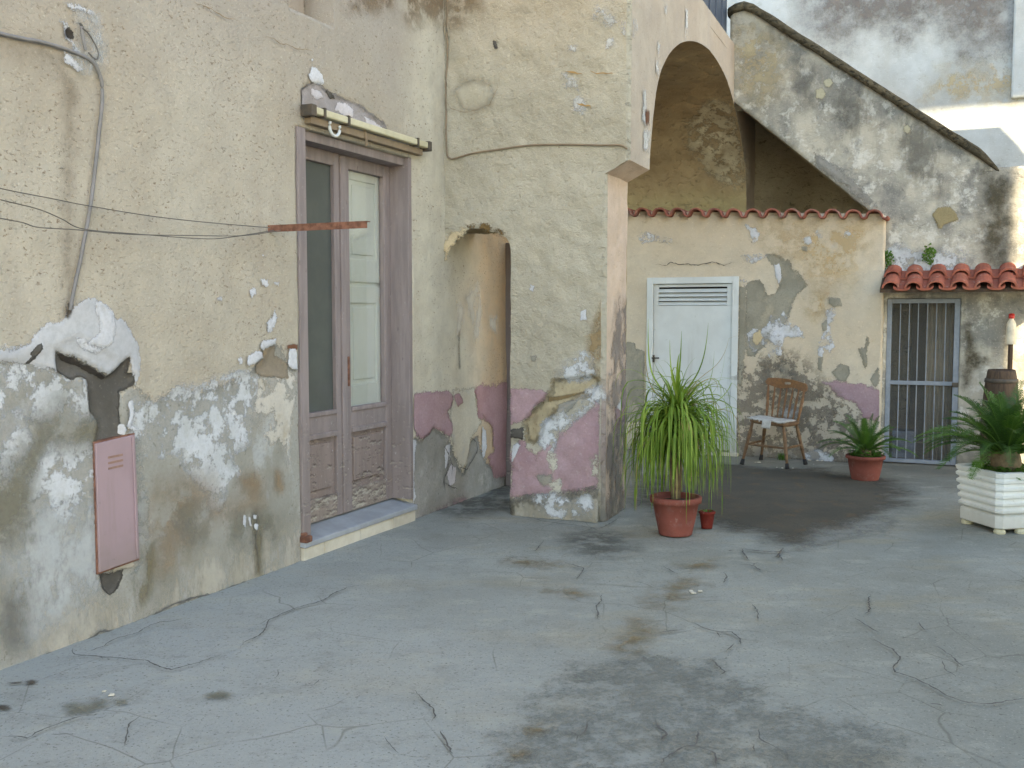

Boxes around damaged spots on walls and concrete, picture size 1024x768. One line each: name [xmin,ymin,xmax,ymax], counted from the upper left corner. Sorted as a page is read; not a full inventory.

mould [815,0,1013,44]
leakage [984,177,1012,266]
flaking render [0,297,301,670]
crack [47,507,259,670]
leakage [235,512,271,574]
crack [245,586,353,642]
peeling [413,310,606,523]
flaking render [738,224,808,385]
leakage [639,355,908,544]
peeling [818,297,880,422]
crack [855,596,1022,706]
crack [414,690,452,753]